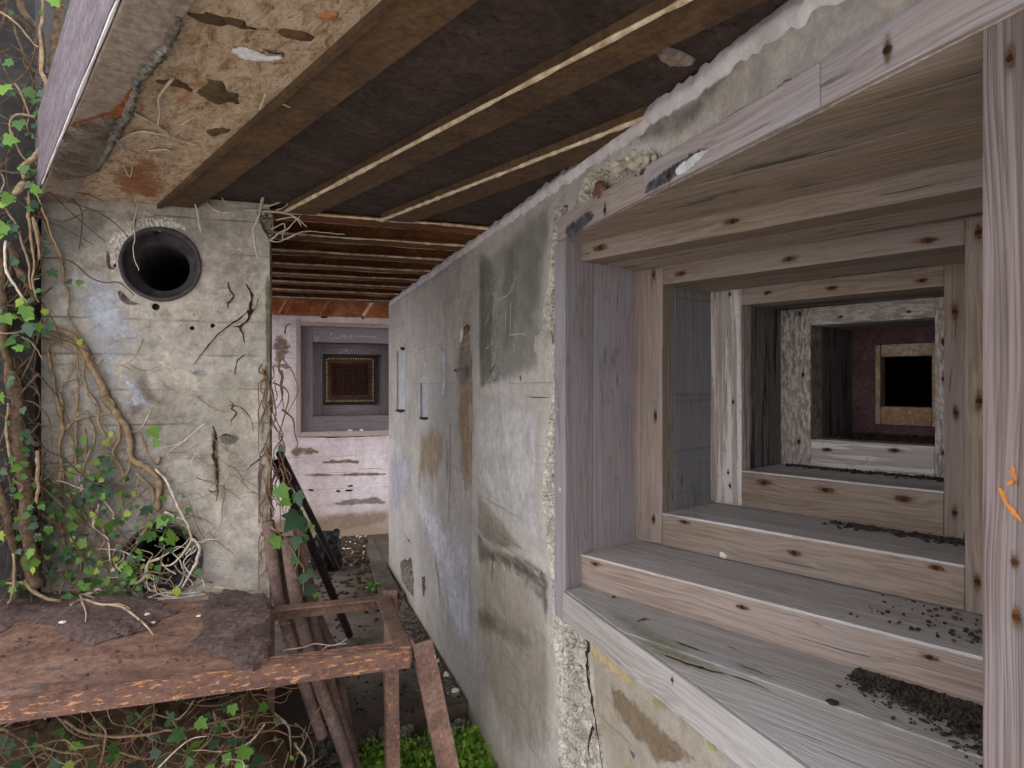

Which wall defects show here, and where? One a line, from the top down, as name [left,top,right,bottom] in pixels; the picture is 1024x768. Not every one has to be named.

corrosion [71,88,133,128]
corrosion [117,162,159,197]
leakage [270,0,693,303]
leakage [480,219,546,377]
peeling [291,447,386,505]
corrosion [459,327,470,476]
leakage [391,454,547,640]
spalling [534,148,663,768]
crack [585,640,643,768]
leakage [592,647,689,763]